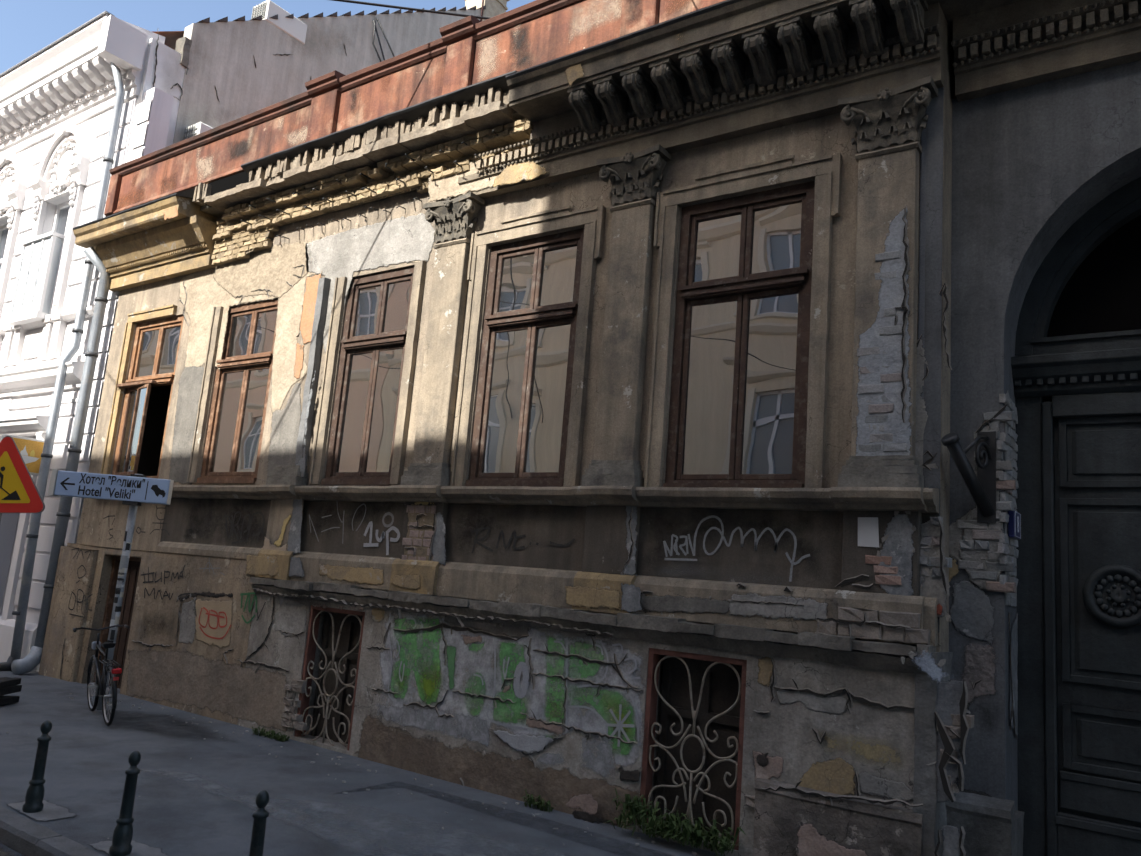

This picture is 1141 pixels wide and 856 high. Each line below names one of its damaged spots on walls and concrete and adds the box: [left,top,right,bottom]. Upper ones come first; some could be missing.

flaking render [179,118,549,414]
flaking render [856,207,938,475]
flaking render [402,504,436,561]
flaking render [865,390,1019,622]
crack [222,588,643,767]
flaking render [794,822,867,856]
crack [754,659,981,856]
flaking render [816,607,930,664]